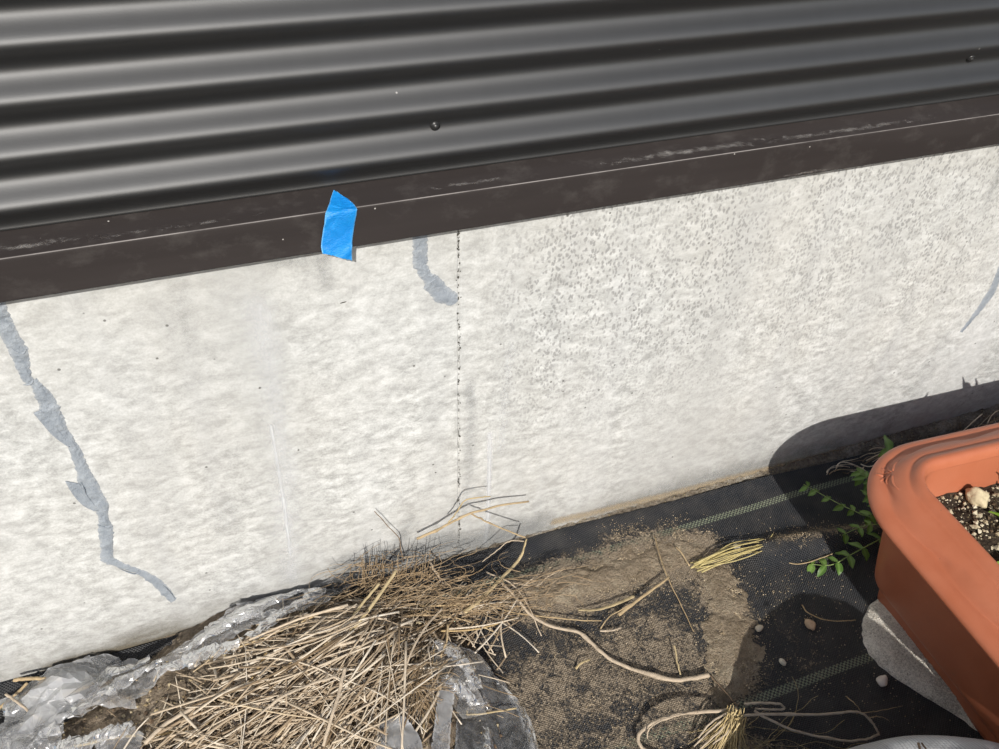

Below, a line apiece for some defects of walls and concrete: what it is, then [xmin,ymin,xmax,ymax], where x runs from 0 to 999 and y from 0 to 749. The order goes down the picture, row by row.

crack [0,302,177,603]
crack [412,230,461,551]
crack [960,267,999,333]